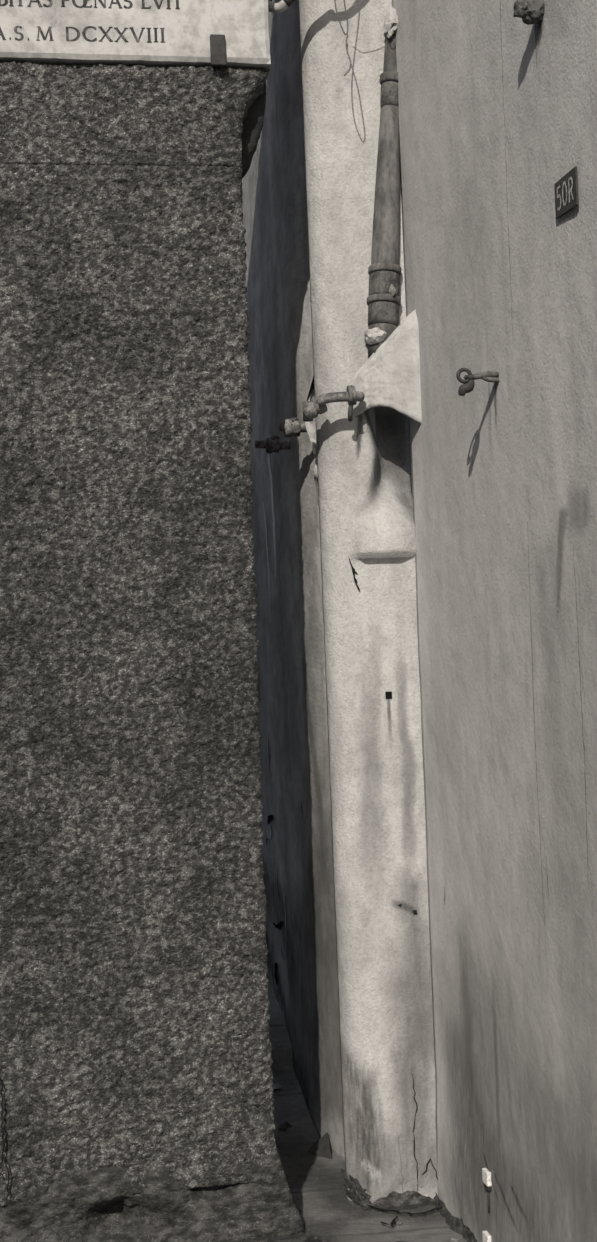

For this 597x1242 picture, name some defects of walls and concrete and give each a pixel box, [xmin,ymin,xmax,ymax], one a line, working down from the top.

crack [368,1072,443,1242]